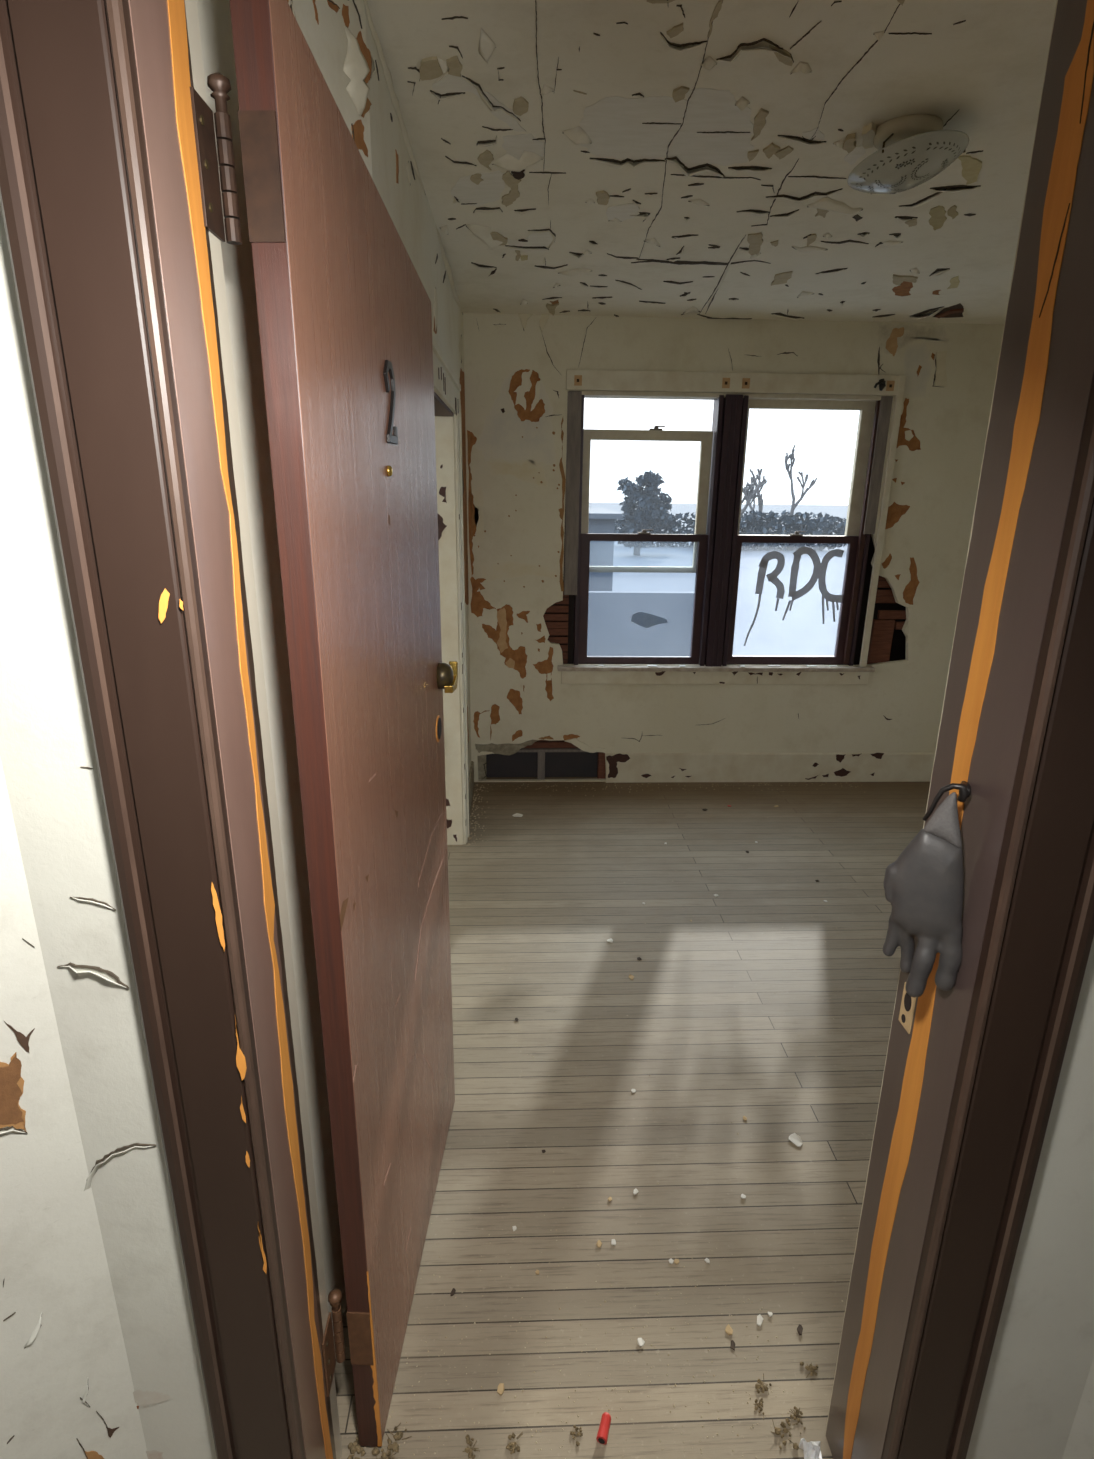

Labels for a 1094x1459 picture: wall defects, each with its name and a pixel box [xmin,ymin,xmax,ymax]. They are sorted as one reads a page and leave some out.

peeling [407,45,556,276]
crack [352,0,966,375]
peeling [563,86,877,177]
peeling [895,150,983,230]
peeling [949,0,1094,830]
peeling [159,588,183,623]
peeling [438,335,630,781]
peeling [167,0,333,1459]
spalling [0,1021,35,1135]
crack [22,938,129,990]
crack [70,896,116,911]
peeling [843,952,940,1459]